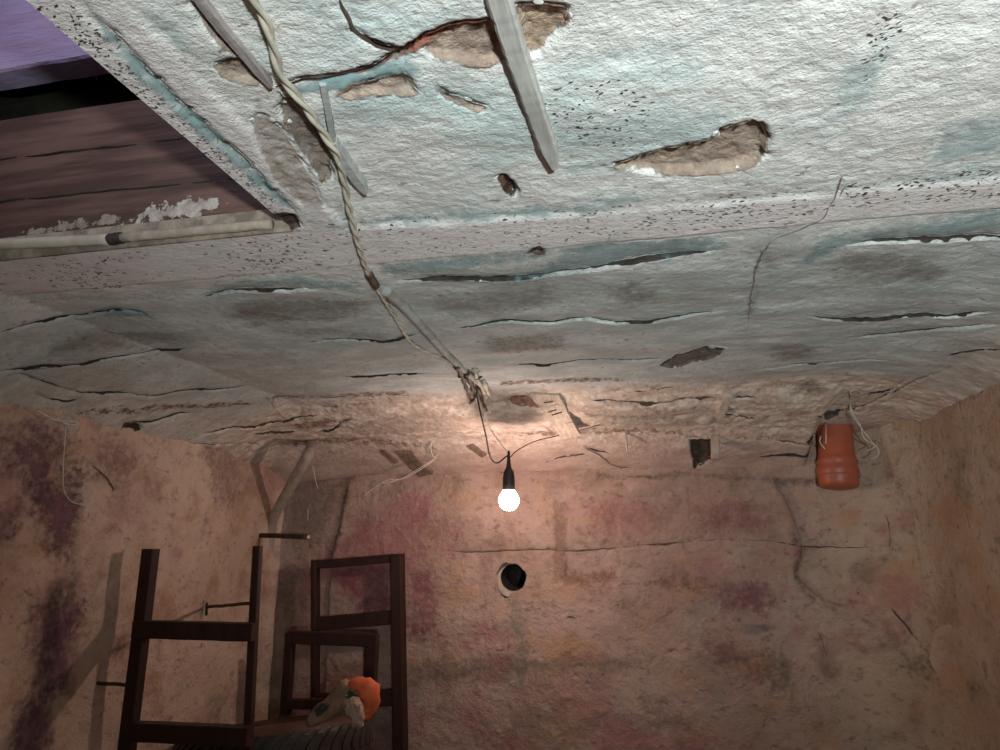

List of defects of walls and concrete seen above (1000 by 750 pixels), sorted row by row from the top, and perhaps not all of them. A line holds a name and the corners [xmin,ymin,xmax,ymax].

crack [276,0,488,87]
spalling [299,19,504,100]
spalling [517,0,573,50]
spalling [124,50,332,230]
spalling [498,173,517,197]
spalling [613,119,769,176]
crack [387,249,725,284]
crack [1,348,245,426]
crack [450,311,718,330]
crack [756,311,1000,411]
damp [0,418,81,561]
damp [15,582,81,750]